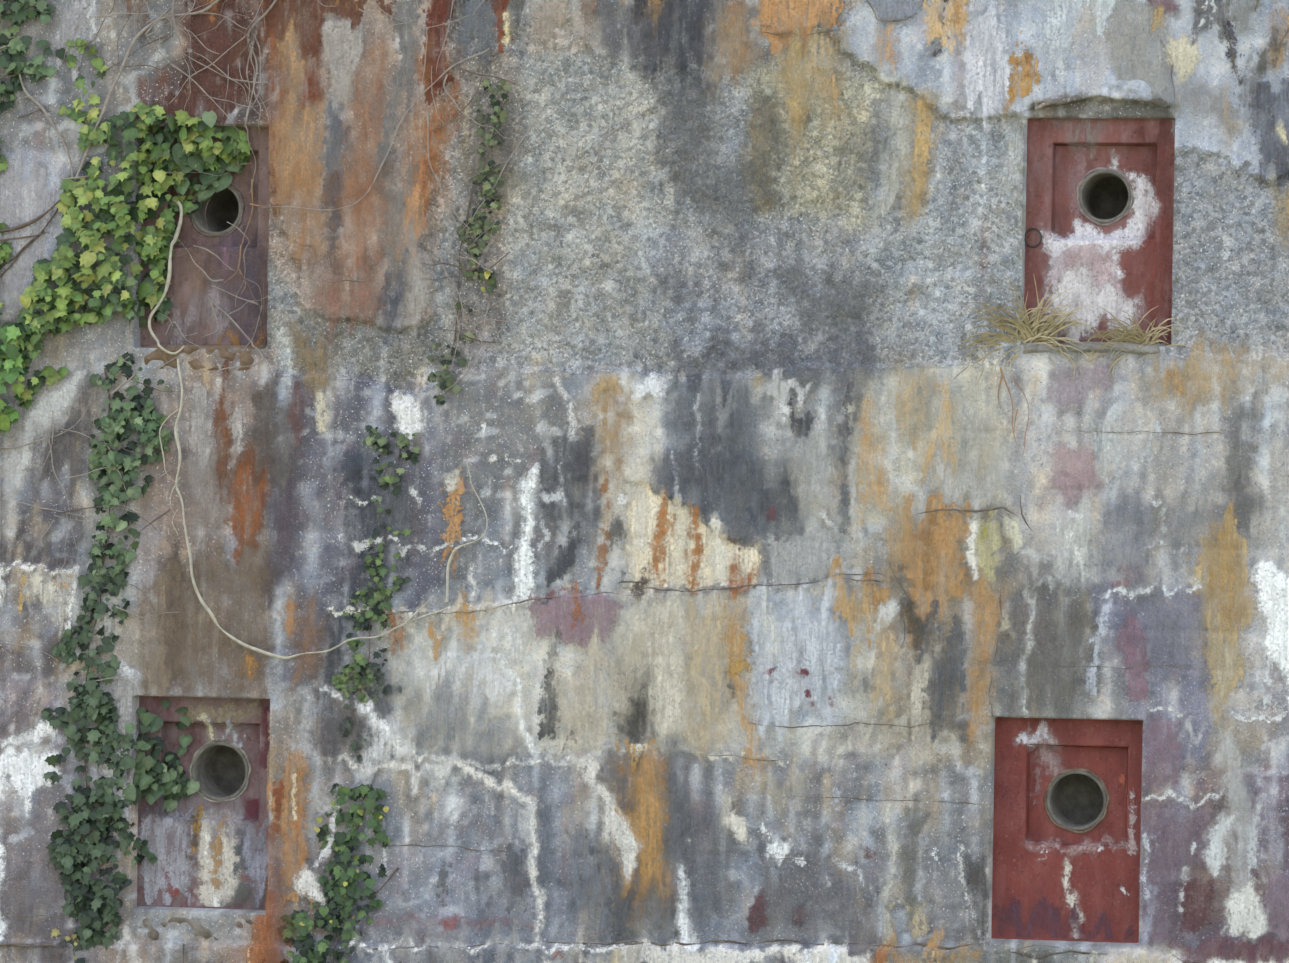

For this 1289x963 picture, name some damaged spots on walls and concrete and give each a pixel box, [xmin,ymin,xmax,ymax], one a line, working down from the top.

rust [151,0,396,283]
rust [401,0,459,255]
spalling [163,0,1289,397]
rust [750,0,856,135]
crack [1129,41,1175,107]
leakage [0,714,61,816]
leakage [0,520,81,631]
rust [115,922,139,963]
rust [140,226,325,963]
leakage [294,787,340,905]
leakage [310,367,928,963]
leakage [930,559,1289,963]